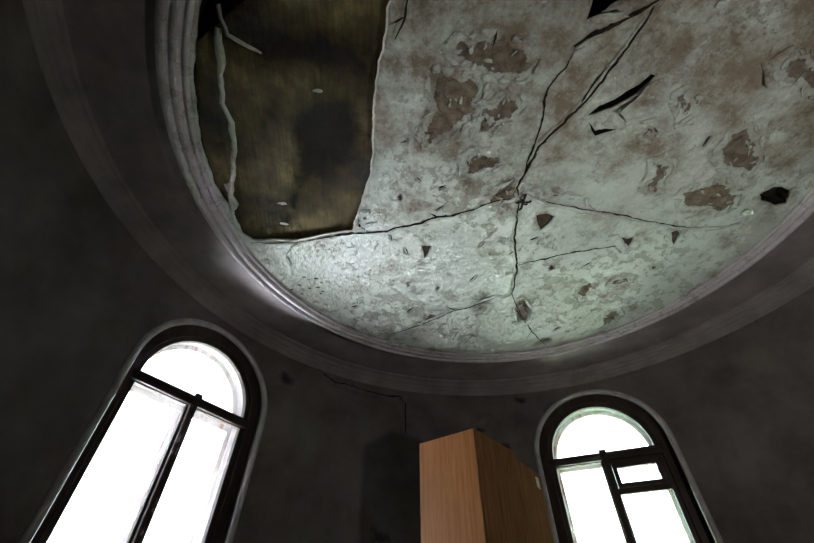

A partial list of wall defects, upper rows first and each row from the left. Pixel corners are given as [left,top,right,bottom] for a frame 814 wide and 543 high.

spalling [193,0,392,242]
crack [251,0,741,347]
spalling [760,187,789,205]
peeling [772,45,814,99]